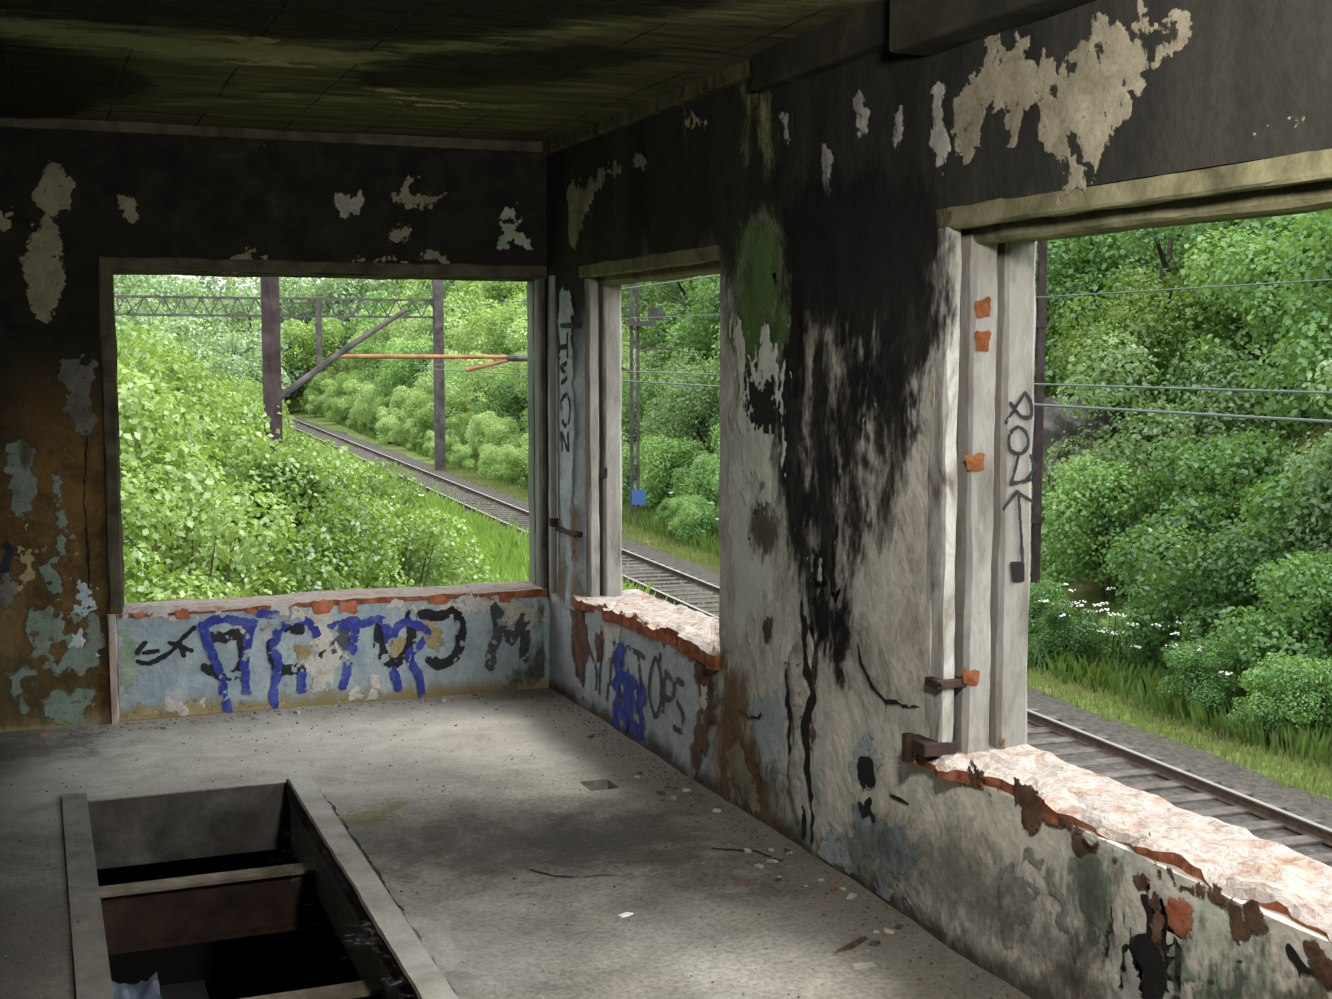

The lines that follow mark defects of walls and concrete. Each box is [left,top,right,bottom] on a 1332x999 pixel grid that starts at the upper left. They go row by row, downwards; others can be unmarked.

water stain [0,18,642,71]
water stain [741,78,771,166]
peeling [929,0,1193,209]
peeling [19,160,76,323]
peeling [352,175,450,264]
peeling [497,202,533,250]
water stain [722,209,918,686]
peeling [0,439,382,726]
spalling [379,591,546,652]
flaking render [569,598,677,701]
peeling [959,758,1269,999]
flaking render [1303,937,1332,990]